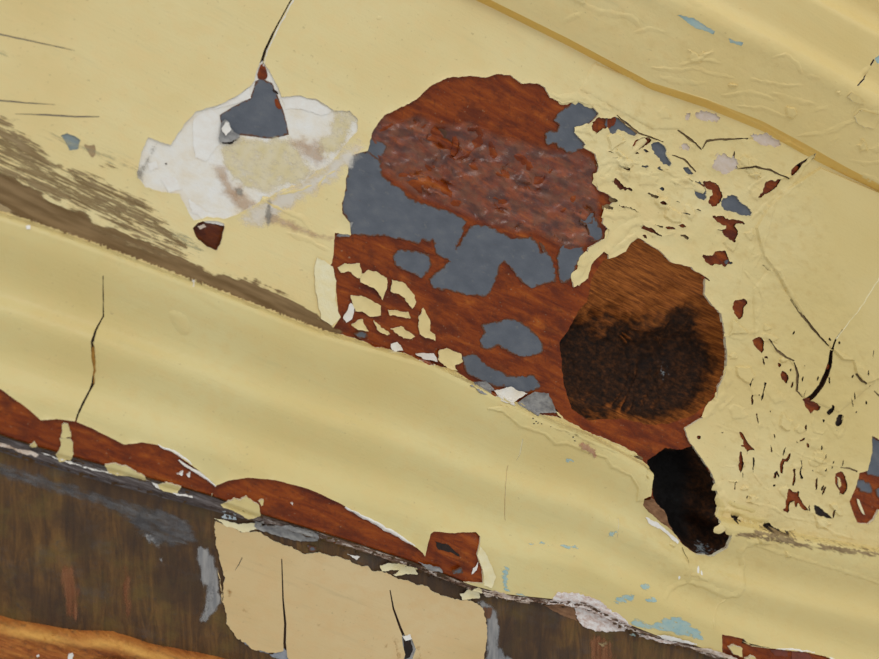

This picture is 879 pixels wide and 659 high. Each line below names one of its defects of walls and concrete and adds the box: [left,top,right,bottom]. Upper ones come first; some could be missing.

crack [260,0,294,66]
crack [76,276,104,418]
peeling [137,61,879,541]
crack [769,279,879,439]
peeling [0,389,530,659]
peeling [643,491,693,552]
peeling [542,592,834,659]